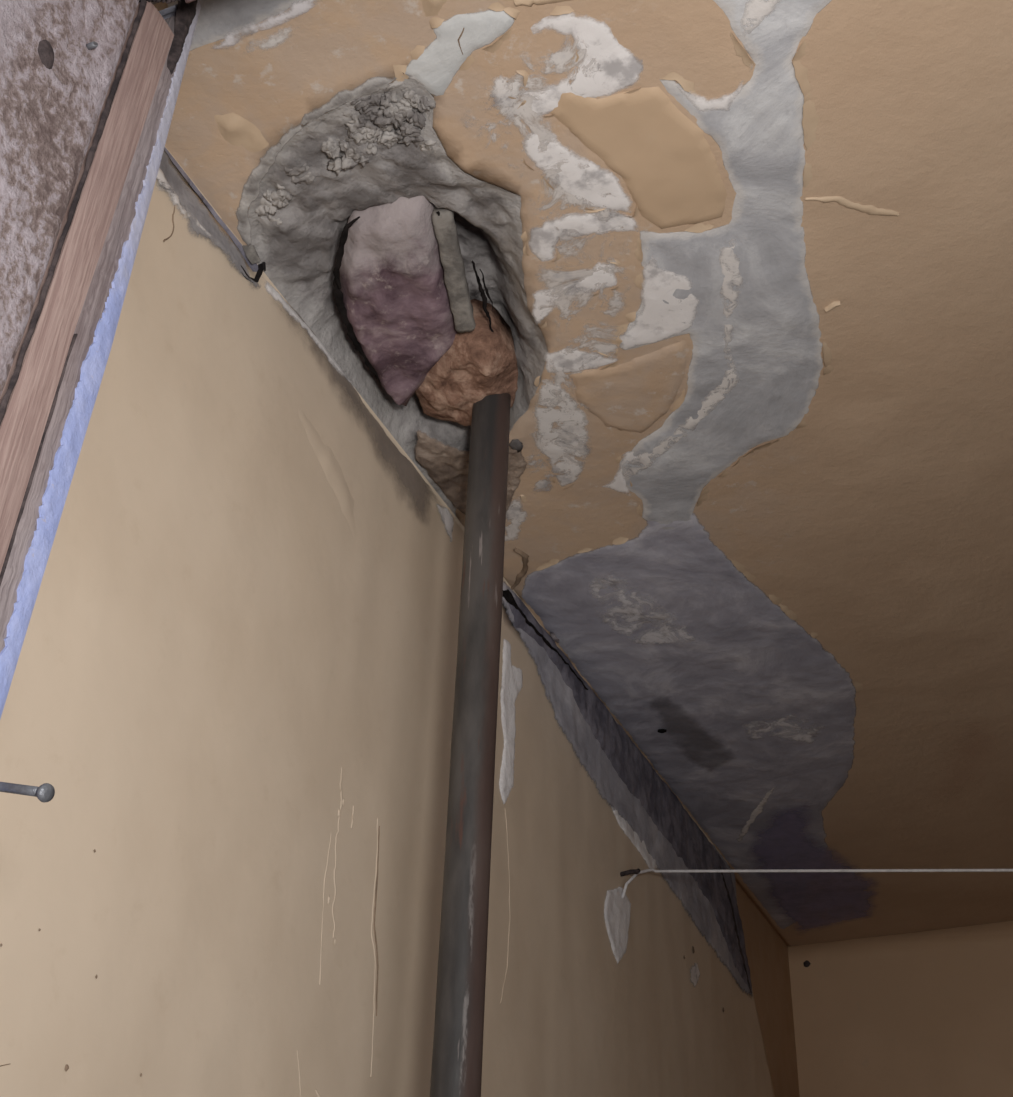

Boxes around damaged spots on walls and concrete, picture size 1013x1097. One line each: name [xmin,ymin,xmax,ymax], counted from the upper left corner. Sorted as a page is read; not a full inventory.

peeling [157,0,864,997]
leakage [753,810,874,930]